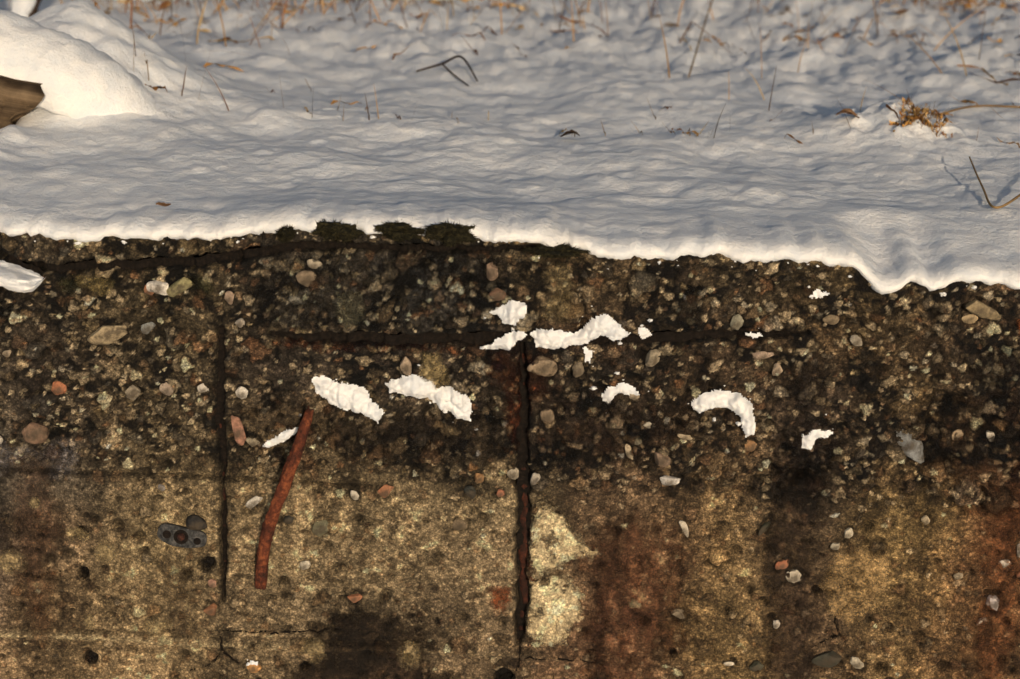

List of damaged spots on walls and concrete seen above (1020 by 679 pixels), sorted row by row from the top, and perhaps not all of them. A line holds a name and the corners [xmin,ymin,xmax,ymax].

crack [571,328,807,344]
leakage [0,441,75,643]
crack [215,326,228,597]
rust [254,406,314,590]
crack [272,331,603,679]
rust [577,515,689,679]
leakage [762,364,841,679]
rust [966,467,1020,679]